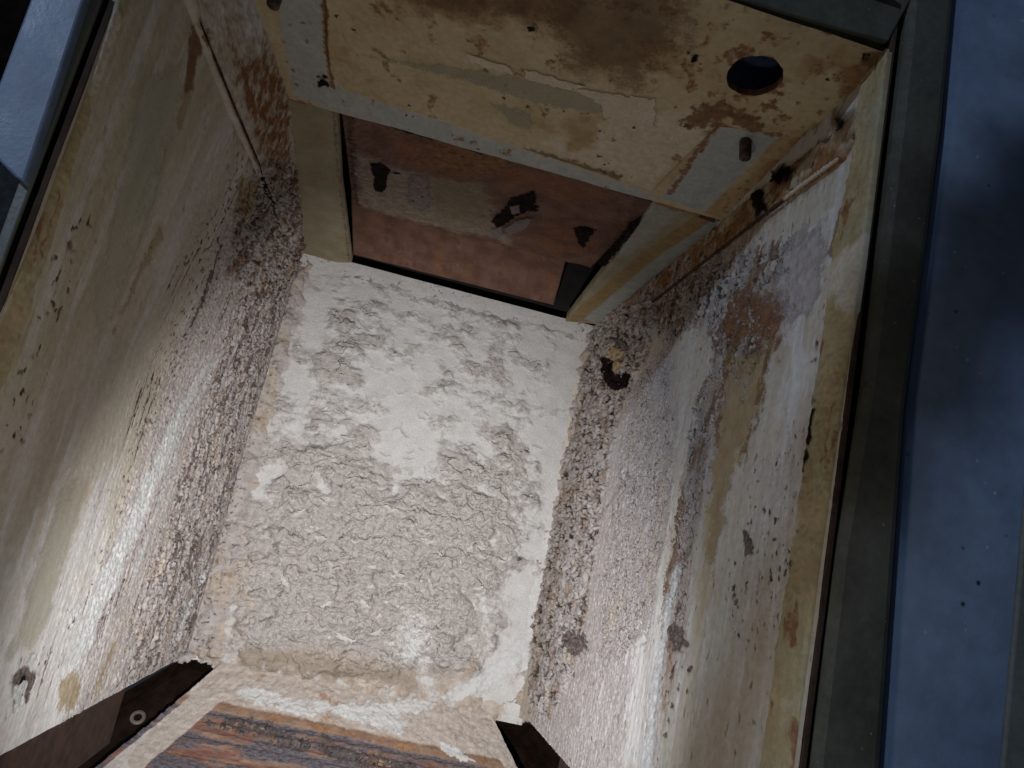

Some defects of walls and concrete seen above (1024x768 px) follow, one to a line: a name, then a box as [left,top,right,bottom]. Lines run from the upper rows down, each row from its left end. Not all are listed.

peeling [466,54,656,128]
corrosion [674,100,765,134]
corrosion [831,108,854,140]
corrosion [391,127,509,180]
corrosion [524,148,622,181]
peeling [490,205,532,239]
corrosion [704,283,790,564]
peeling [223,274,658,724]
water stain [643,565,680,768]
peeling [440,741,476,762]